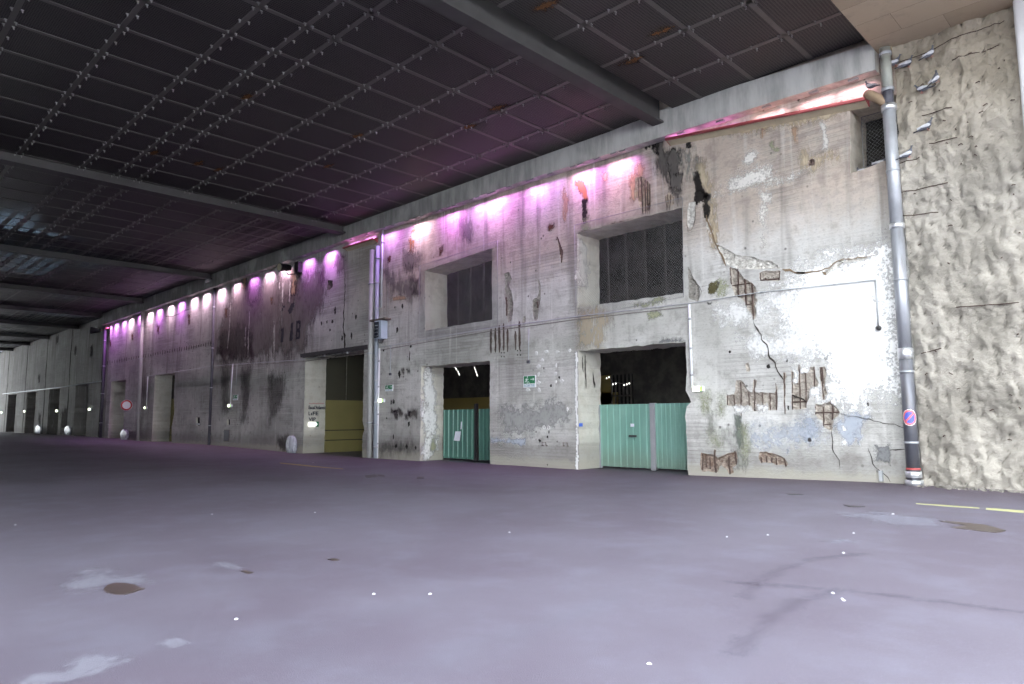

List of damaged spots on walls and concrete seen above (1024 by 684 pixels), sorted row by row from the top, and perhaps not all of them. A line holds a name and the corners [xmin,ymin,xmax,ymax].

water stain [459,219,472,242]
corrosion [548,180,588,231]
crack [687,179,782,266]
water stain [383,250,428,301]
crack [782,255,875,275]
water stain [218,254,344,366]
peeling [718,246,840,431]
crack [753,321,805,401]
spalling [700,449,738,474]
water stain [734,413,748,468]
spalling [759,452,788,467]
crack [831,414,904,481]